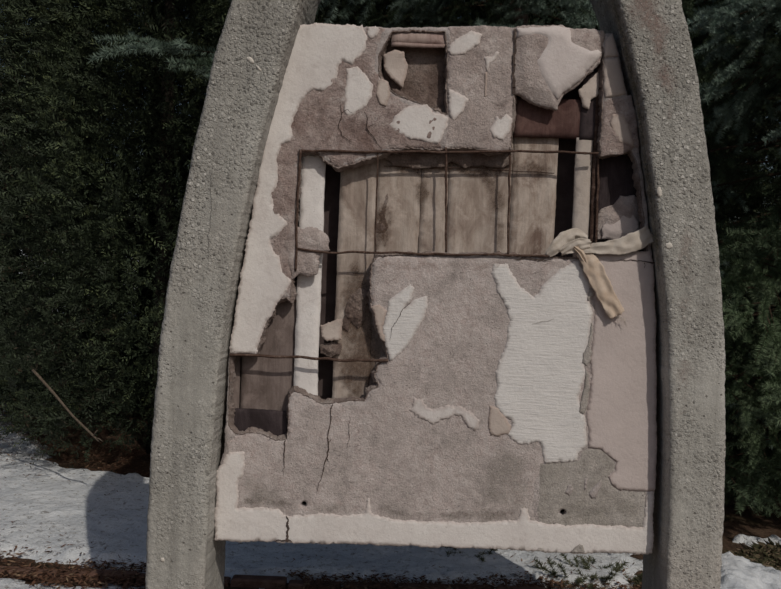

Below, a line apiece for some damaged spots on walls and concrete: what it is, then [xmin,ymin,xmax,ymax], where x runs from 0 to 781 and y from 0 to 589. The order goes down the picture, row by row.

crack [338,104,379,146]
peeling [257,25,517,354]
crack [317,404,350,491]
peeling [226,251,646,527]